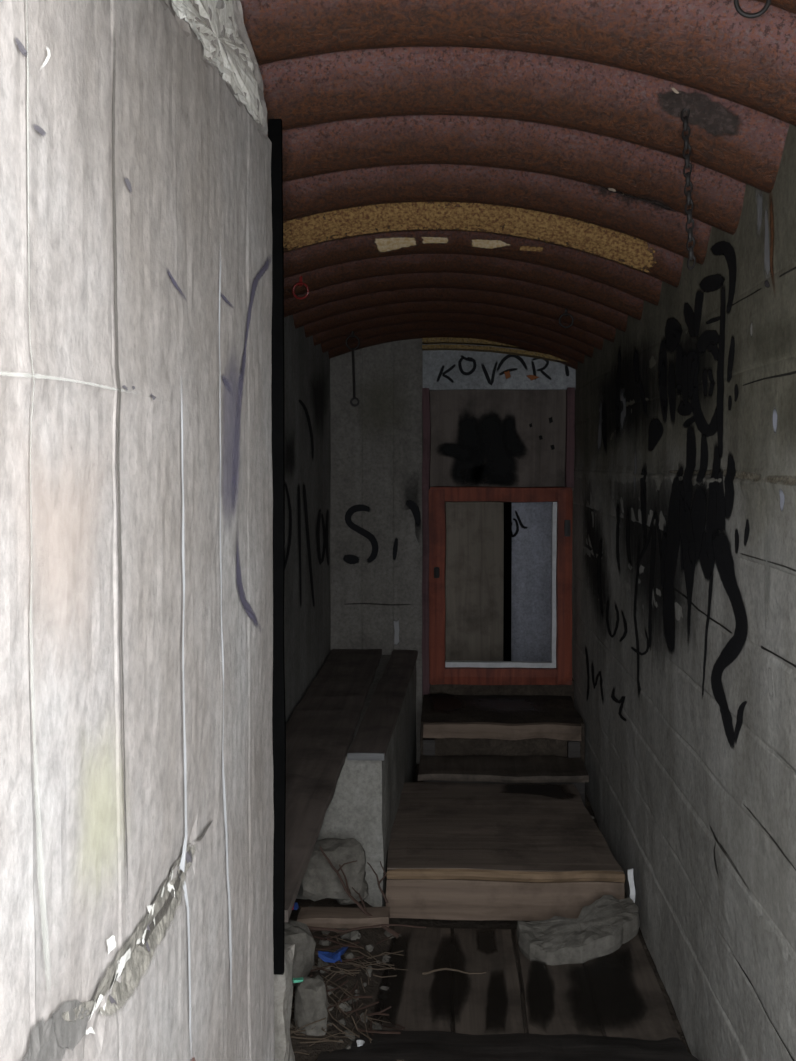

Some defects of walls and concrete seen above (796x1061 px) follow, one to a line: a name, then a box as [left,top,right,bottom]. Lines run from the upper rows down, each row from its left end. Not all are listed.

spalling [171,0,263,125]
rust [757,196,774,288]
spalling [23,1000,89,1061]